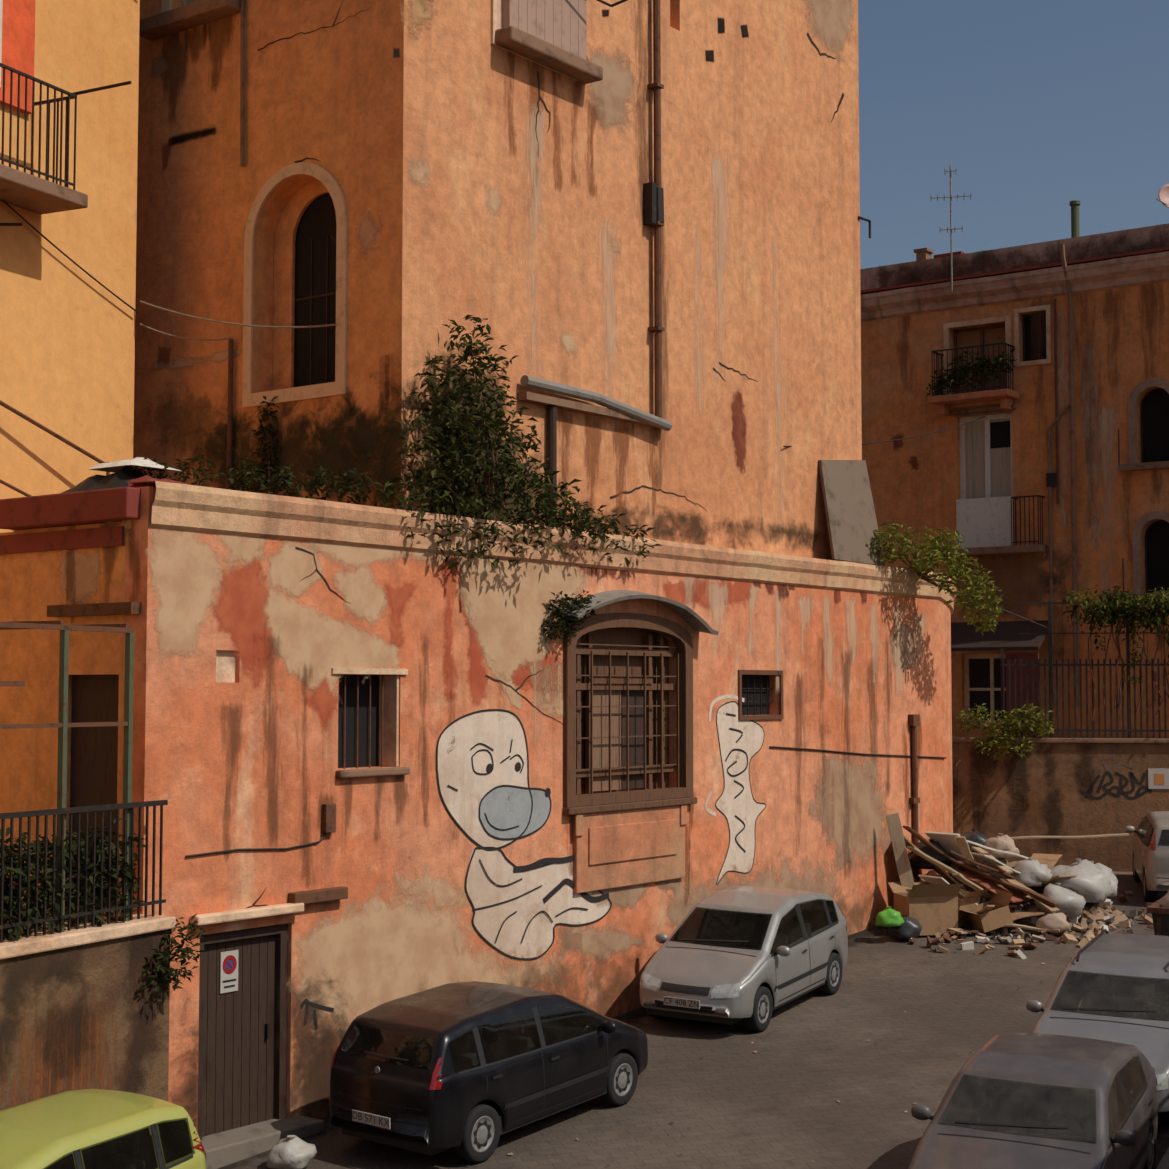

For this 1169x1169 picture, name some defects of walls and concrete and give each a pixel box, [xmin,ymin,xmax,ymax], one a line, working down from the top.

crack [258,4,369,51]
peeling [804,0,854,60]
peeling [589,50,635,129]
water stain [527,111,544,223]
water stain [878,235,1169,287]
crack [295,547,350,603]
peeling [147,528,629,725]
water stain [799,596,833,682]
water stain [846,599,857,663]
water stain [870,605,879,683]
water stain [894,607,903,694]
water stain [122,930,168,1093]